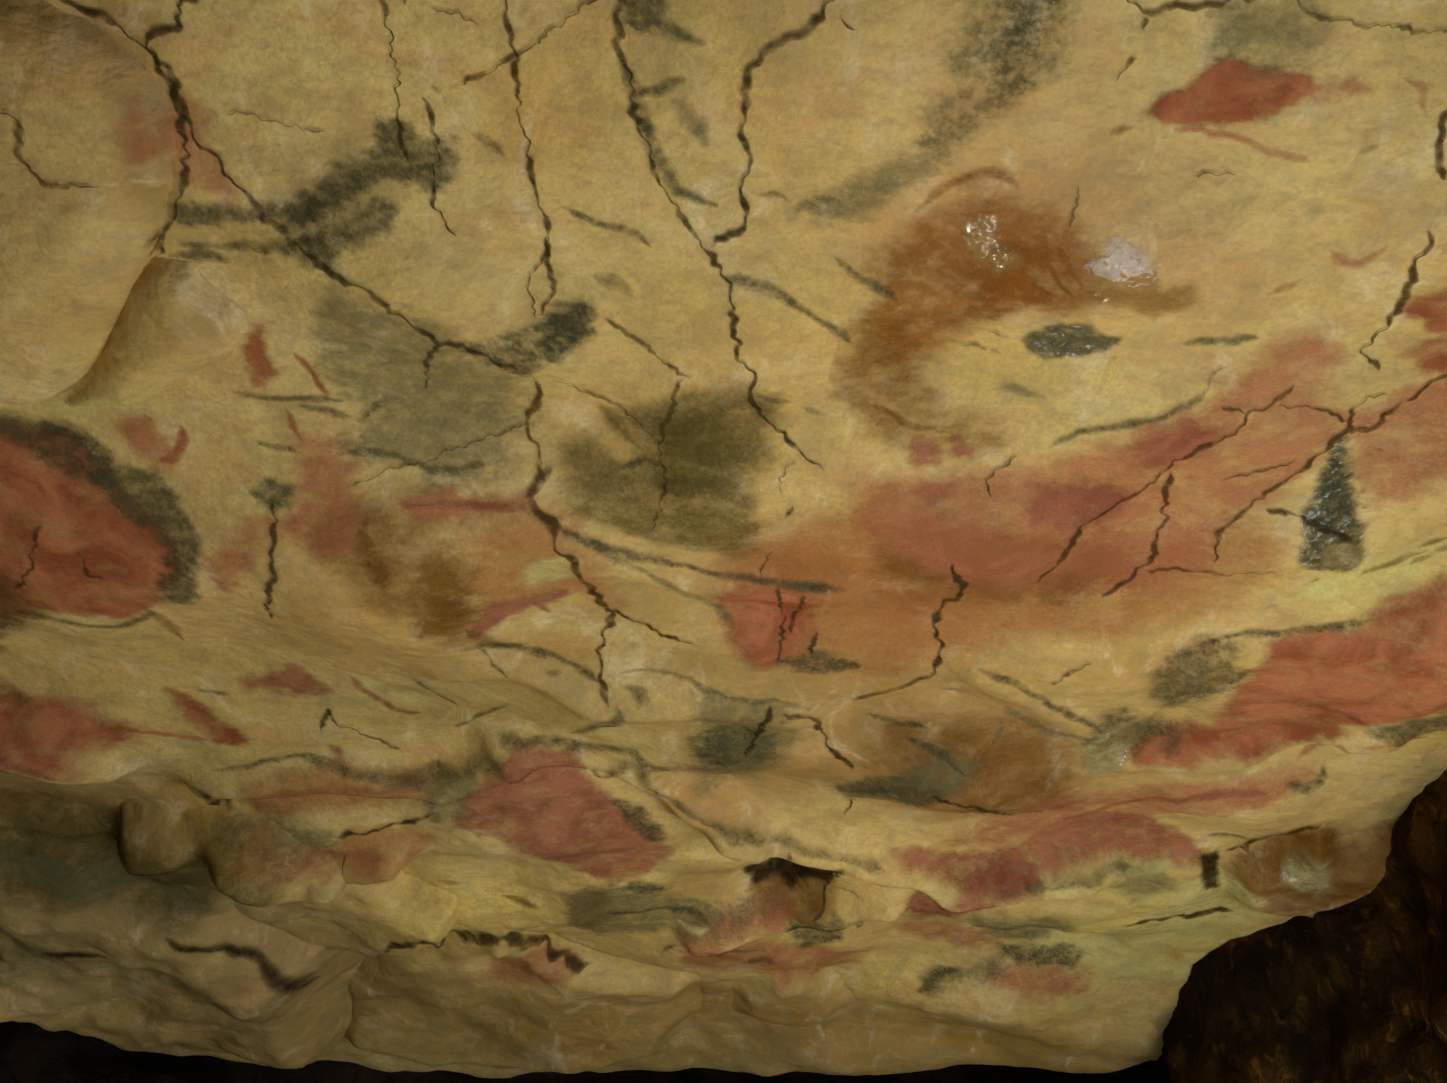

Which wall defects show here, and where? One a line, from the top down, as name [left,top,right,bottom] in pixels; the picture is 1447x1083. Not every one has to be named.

crack [1116,0,1249,81]
water stain [1151,7,1313,137]
crack [1436,113,1447,180]
crack [381,0,856,515]
crack [61,0,693,706]
water stain [244,277,1447,682]
crack [1037,235,1447,596]
crack [855,566,968,700]
water stain [171,692,246,745]
water stain [248,714,880,880]
water stain [837,715,1326,994]
water stain [170,943,320,994]